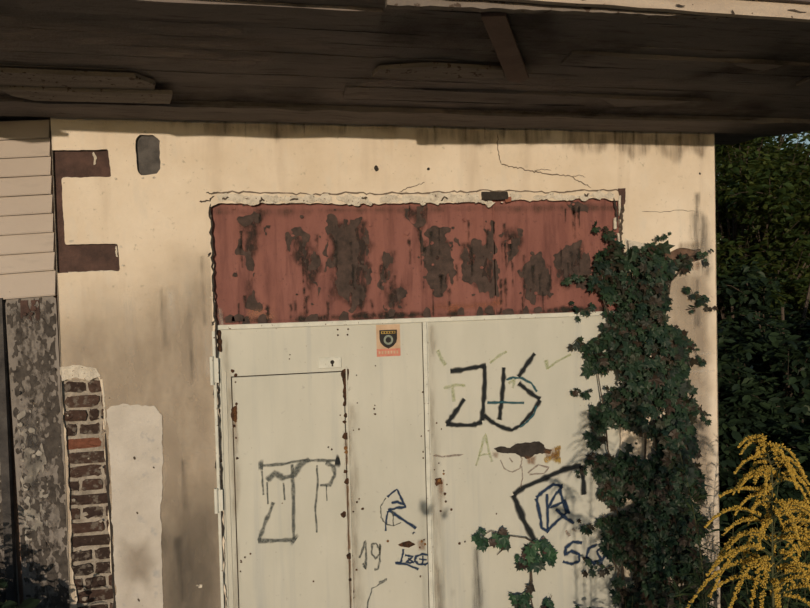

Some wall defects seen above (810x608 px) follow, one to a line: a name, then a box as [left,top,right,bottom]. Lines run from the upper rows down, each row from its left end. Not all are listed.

crack [497,134,591,188]
spalling [211,189,618,316]
flaking render [7,297,163,608]
rust [339,369,360,454]